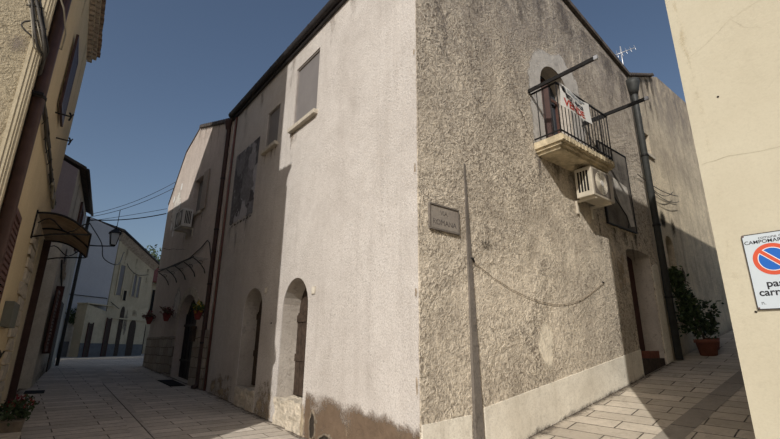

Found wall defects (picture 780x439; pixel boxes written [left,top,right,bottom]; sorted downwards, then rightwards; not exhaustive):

leakage [304,393,419,439]